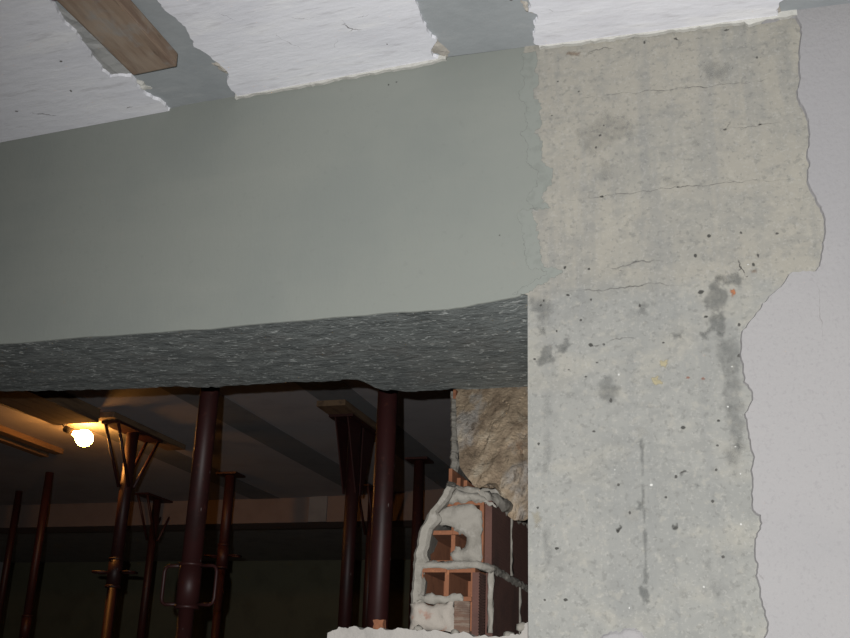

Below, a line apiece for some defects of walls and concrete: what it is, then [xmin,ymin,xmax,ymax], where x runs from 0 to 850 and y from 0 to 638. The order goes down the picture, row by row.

flaking render [53,0,235,108]
flaking render [417,0,850,638]